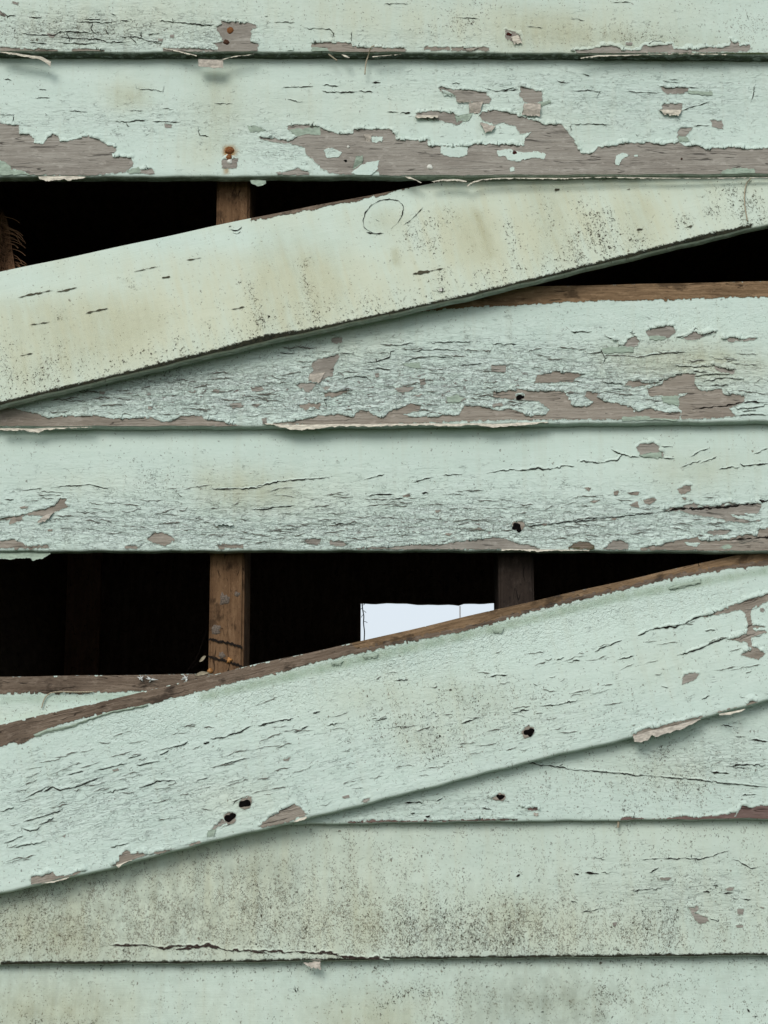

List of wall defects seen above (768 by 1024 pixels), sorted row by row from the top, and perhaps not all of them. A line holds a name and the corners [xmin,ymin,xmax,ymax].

peeling [571,35,751,59]
peeling [0,120,155,182]
peeling [247,81,768,186]
peeling [0,333,747,433]
crack [5,445,768,547]
peeling [302,480,768,552]
peeling [699,589,768,660]
crack [0,606,768,864]
crack [574,856,611,875]
crack [631,850,760,891]
crack [703,884,751,900]
crack [109,941,390,960]